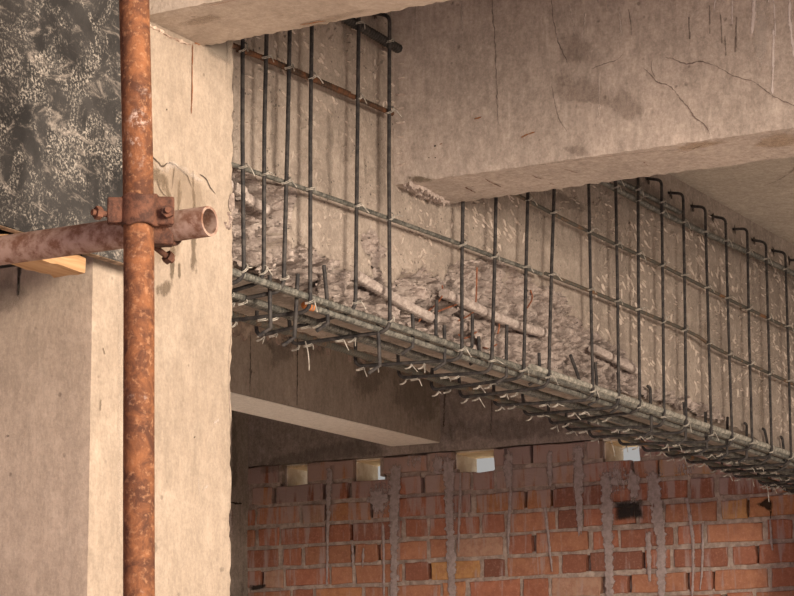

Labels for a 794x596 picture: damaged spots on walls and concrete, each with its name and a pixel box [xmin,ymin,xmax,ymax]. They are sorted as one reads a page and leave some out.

crack [491,0,499,117]
crack [646,57,792,131]
leakage [153,168,182,210]
crack [153,157,215,197]
leakage [157,246,181,296]
spalling [224,167,726,423]